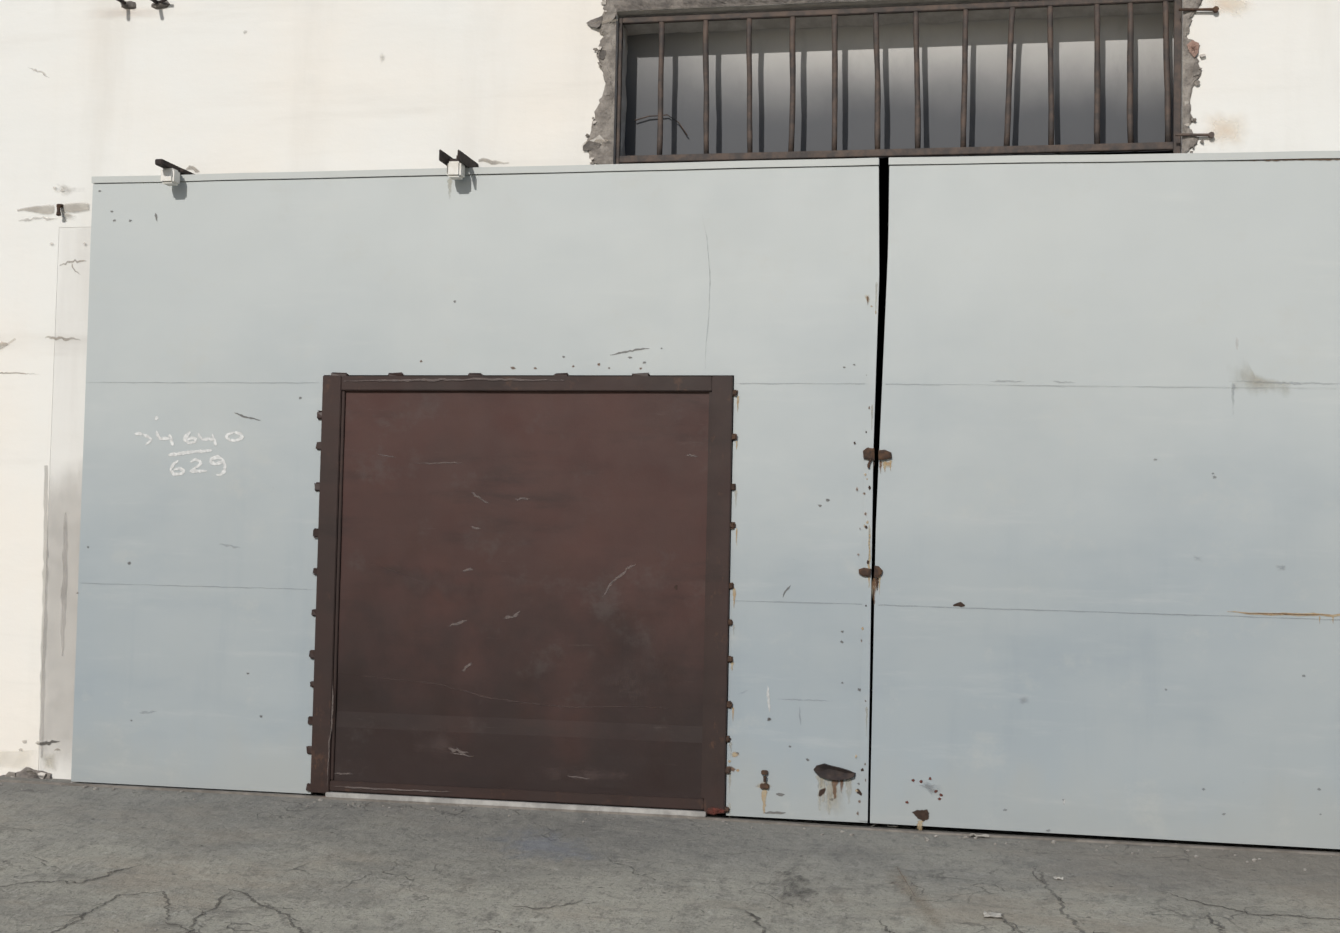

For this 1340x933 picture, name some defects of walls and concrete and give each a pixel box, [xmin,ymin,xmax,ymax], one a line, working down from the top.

spalling [583,0,864,164]
spalling [1182,0,1206,153]
rust [857,512,881,606]
rust [1233,611,1340,621]
rust [905,777,943,830]
crack [1,867,305,933]
crack [464,900,583,933]
crack [745,911,766,933]
crack [1160,891,1340,923]